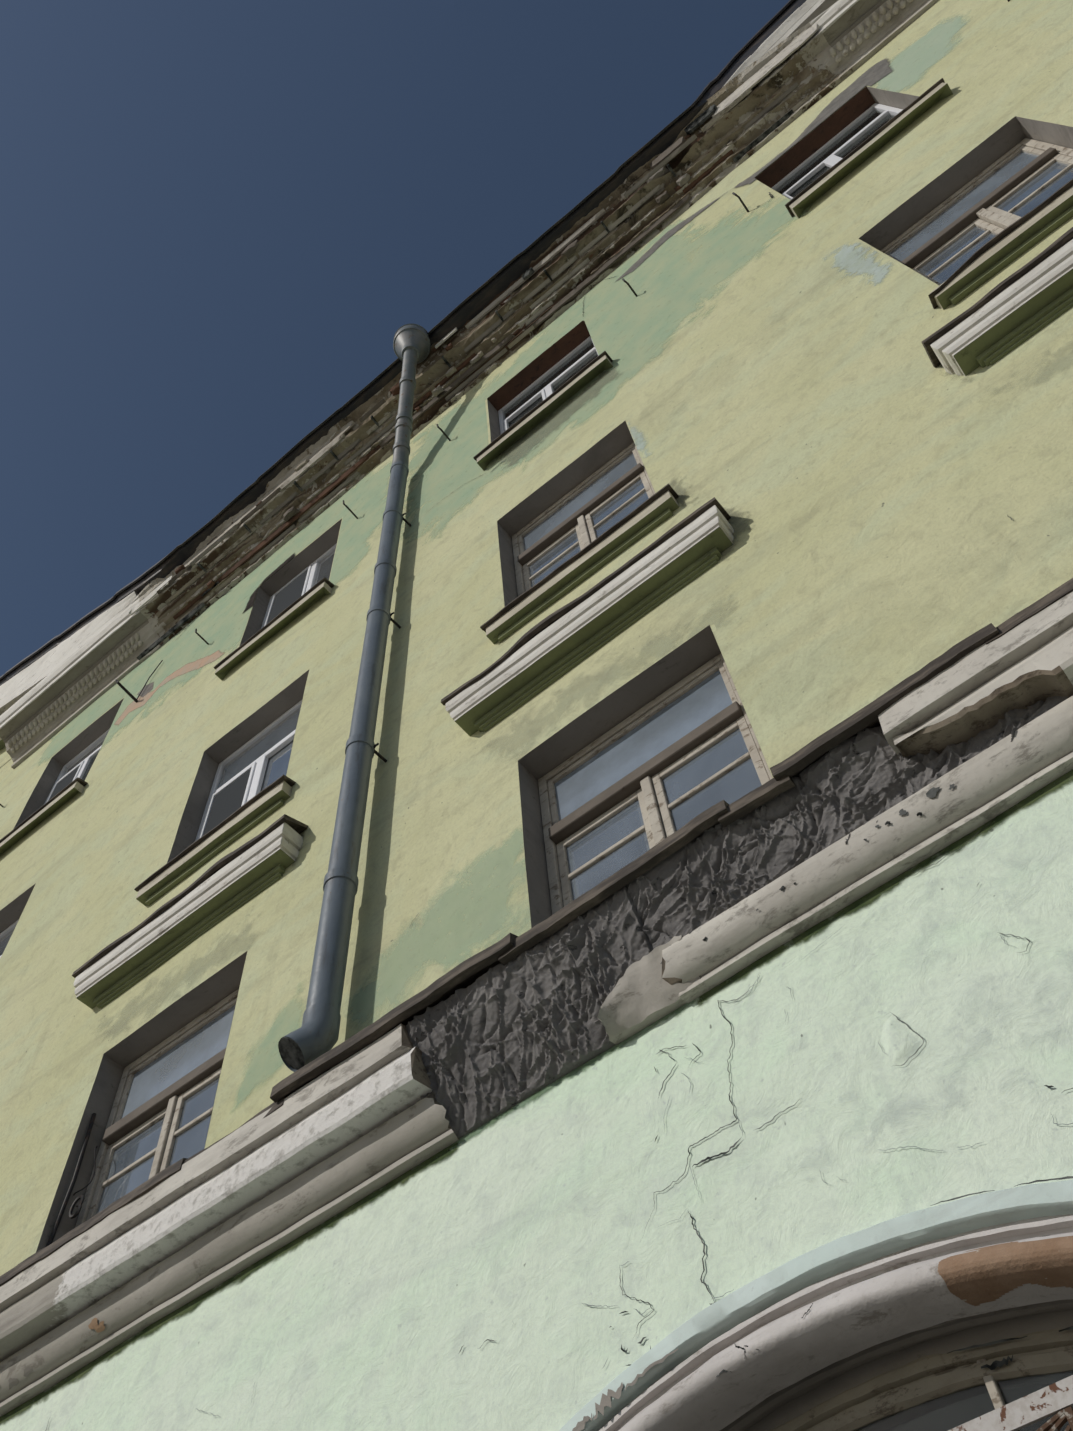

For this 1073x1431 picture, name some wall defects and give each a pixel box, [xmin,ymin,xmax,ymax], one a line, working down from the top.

spalling [863,784,955,841]
crack [878,1013,924,1067]
crack [581,927,842,1366]
flaking render [938,1236,1073,1306]